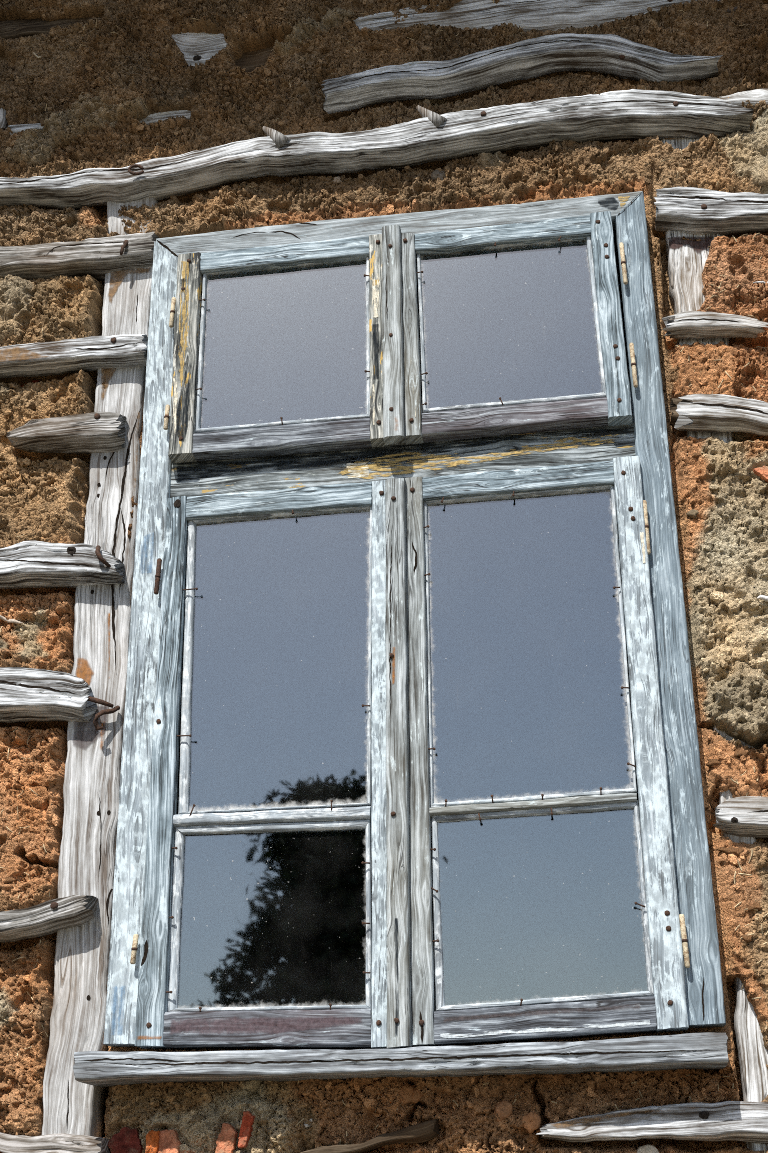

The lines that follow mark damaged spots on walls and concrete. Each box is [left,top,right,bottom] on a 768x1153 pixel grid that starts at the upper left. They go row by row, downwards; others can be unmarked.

peeling [177,427,626,482]